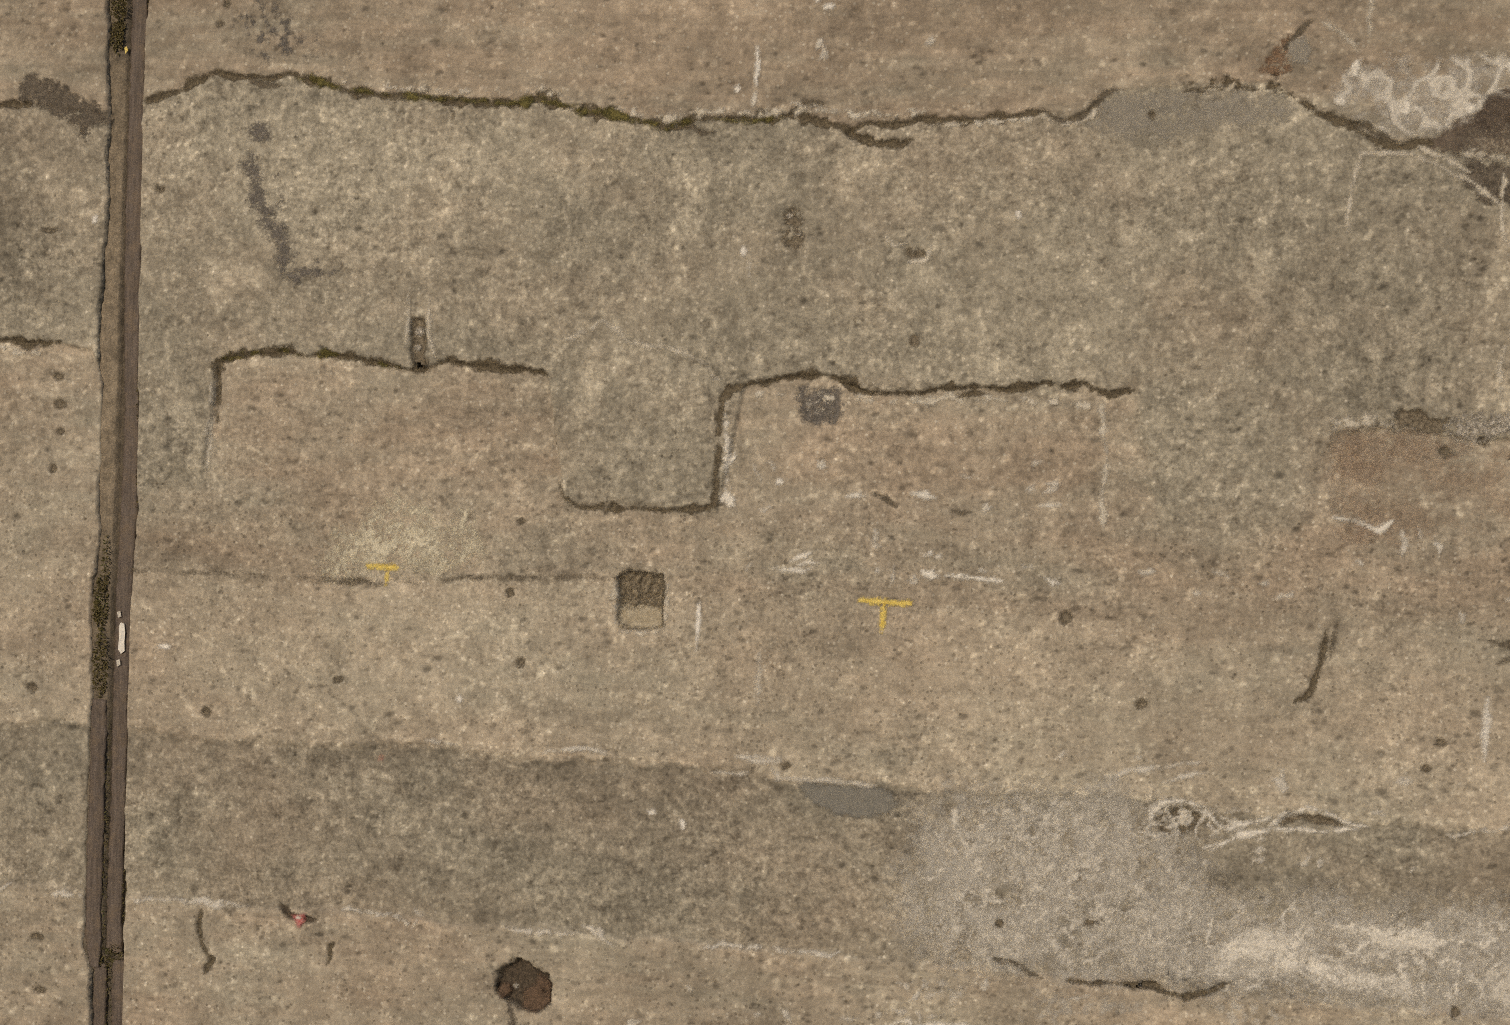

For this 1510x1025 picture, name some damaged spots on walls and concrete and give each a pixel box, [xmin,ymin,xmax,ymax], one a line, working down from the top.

crack [0,99,32,109]
crack [143,69,1115,149]
damp [1334,55,1510,205]
crack [0,336,61,356]
crack [204,343,548,467]
crack [559,320,1135,526]
crack [993,957,1229,1002]